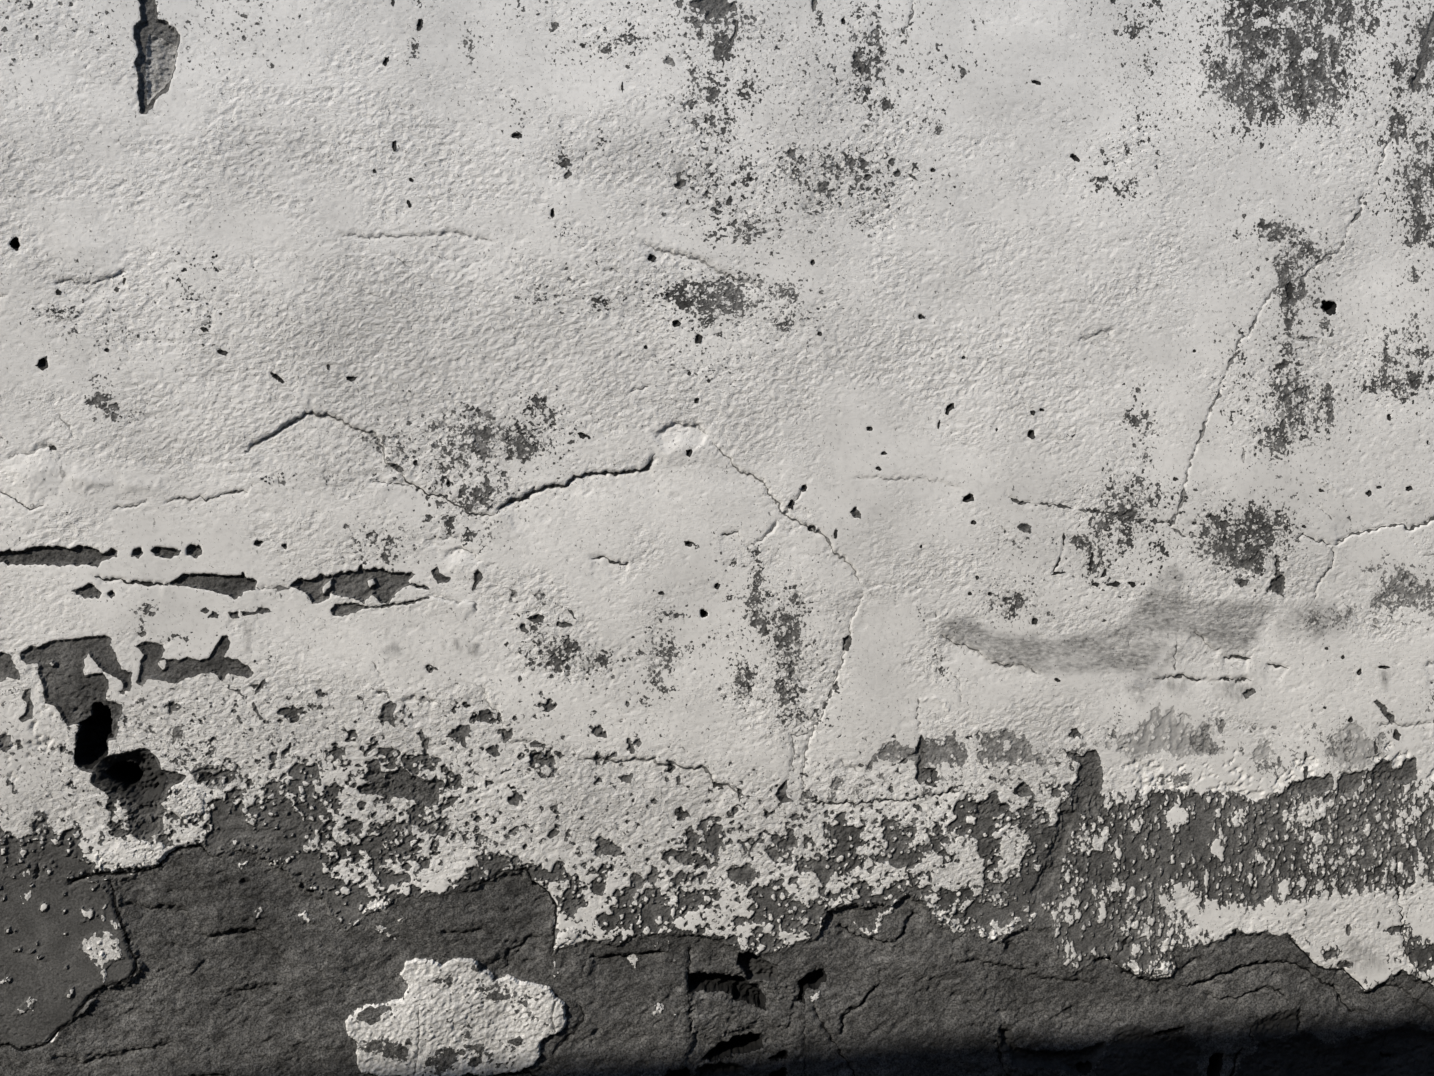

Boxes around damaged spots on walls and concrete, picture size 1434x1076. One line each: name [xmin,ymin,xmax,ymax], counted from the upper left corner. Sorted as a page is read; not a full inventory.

peeling [20,251,229,428]
crack [112,478,286,510]
crack [244,411,960,805]
spalling [0,521,1434,1076]
crack [1011,11,1434,571]
crack [1297,483,1434,599]